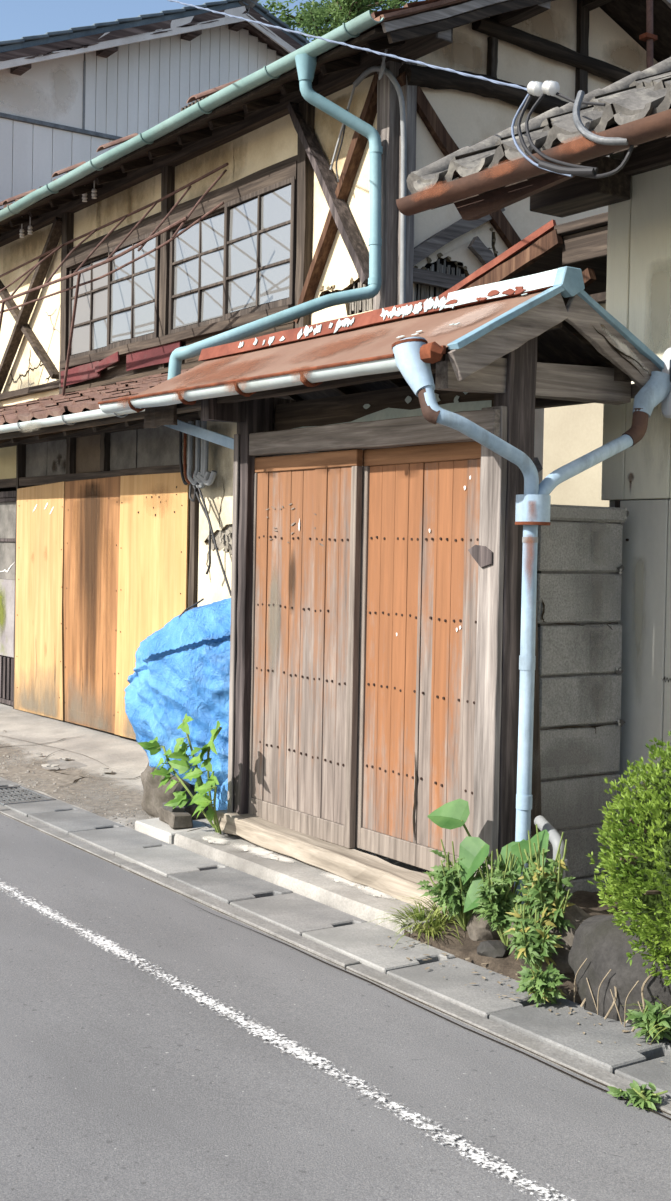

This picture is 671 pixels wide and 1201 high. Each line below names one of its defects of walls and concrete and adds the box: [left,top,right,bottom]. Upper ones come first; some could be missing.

rust [563,137,593,151]
rust [491,162,511,176]
peeling [380,267,563,326]
peeling [238,318,355,348]
crack [8,353,50,388]
rust [98,335,444,412]
leakage [80,485,100,625]